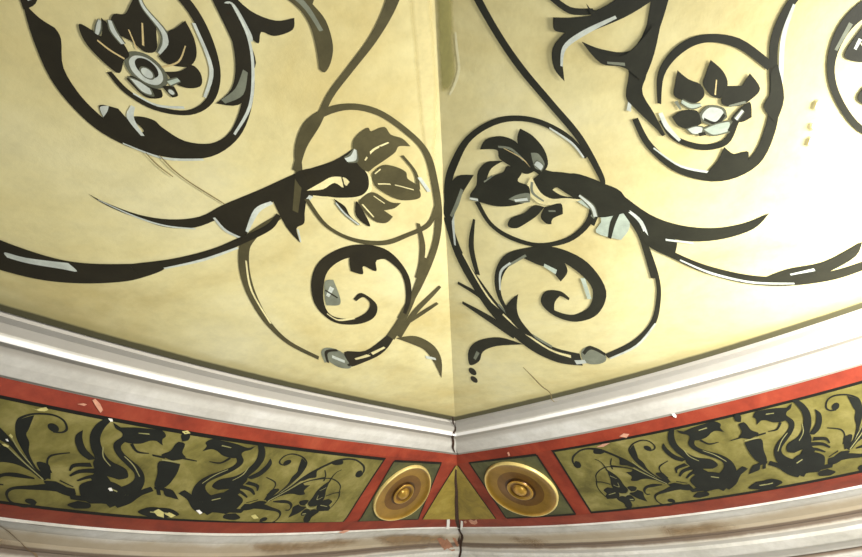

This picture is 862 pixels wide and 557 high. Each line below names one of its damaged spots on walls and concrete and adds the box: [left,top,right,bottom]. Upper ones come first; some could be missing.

crack [451,417,463,557]